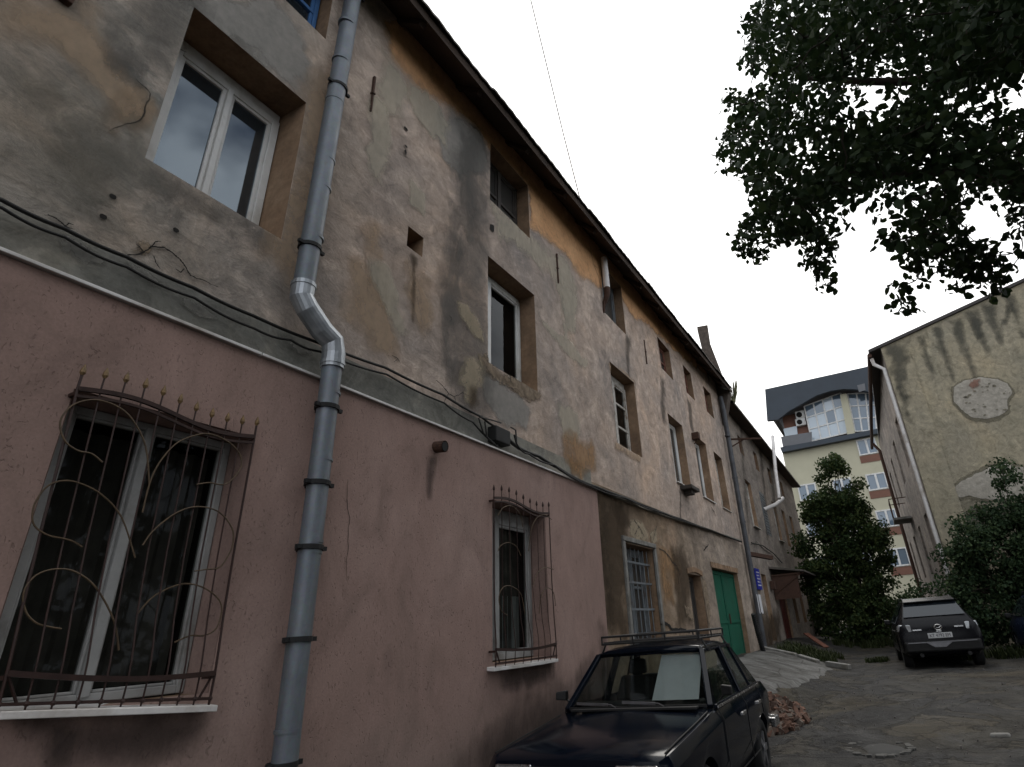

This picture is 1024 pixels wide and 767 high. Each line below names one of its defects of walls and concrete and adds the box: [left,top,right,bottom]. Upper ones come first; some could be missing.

crack [109,79,151,131]
flaking render [385,20,707,375]
crack [127,241,217,287]
damp [954,297,1016,369]
damp [887,345,908,415]
flaking render [951,376,1015,423]